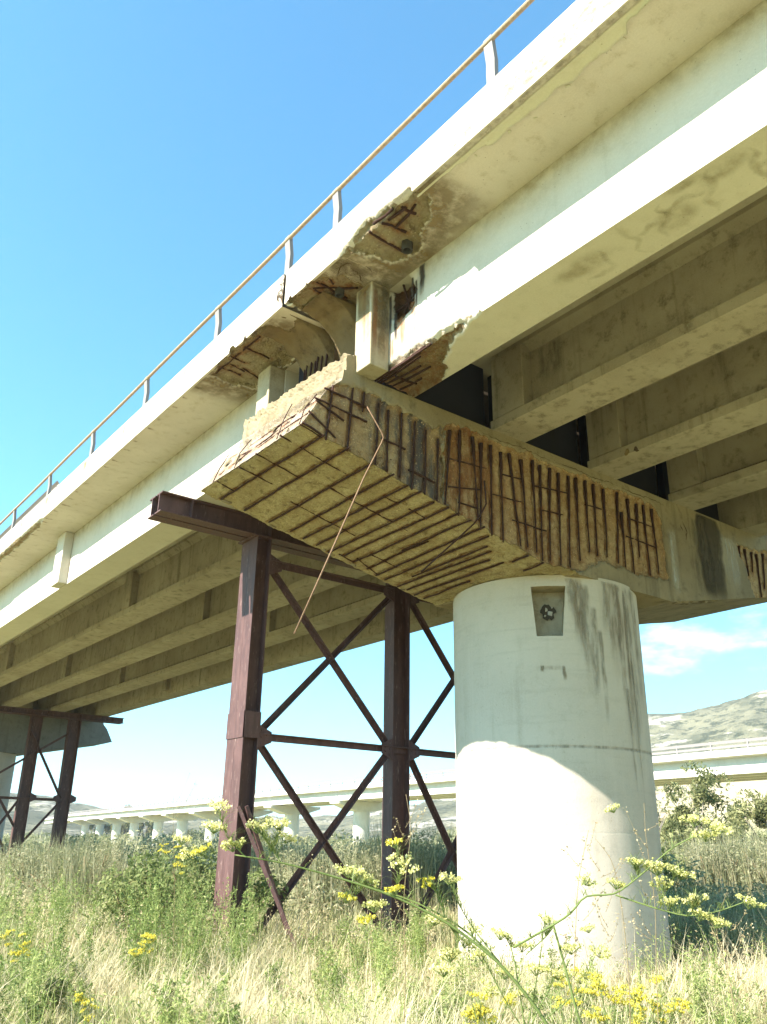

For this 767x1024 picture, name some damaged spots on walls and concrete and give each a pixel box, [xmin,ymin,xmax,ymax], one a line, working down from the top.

spalling [339,0,651,262]
spalling [201,310,669,605]
leakage [693,515,725,593]
spalling [736,543,767,598]
leakage [569,581,638,730]